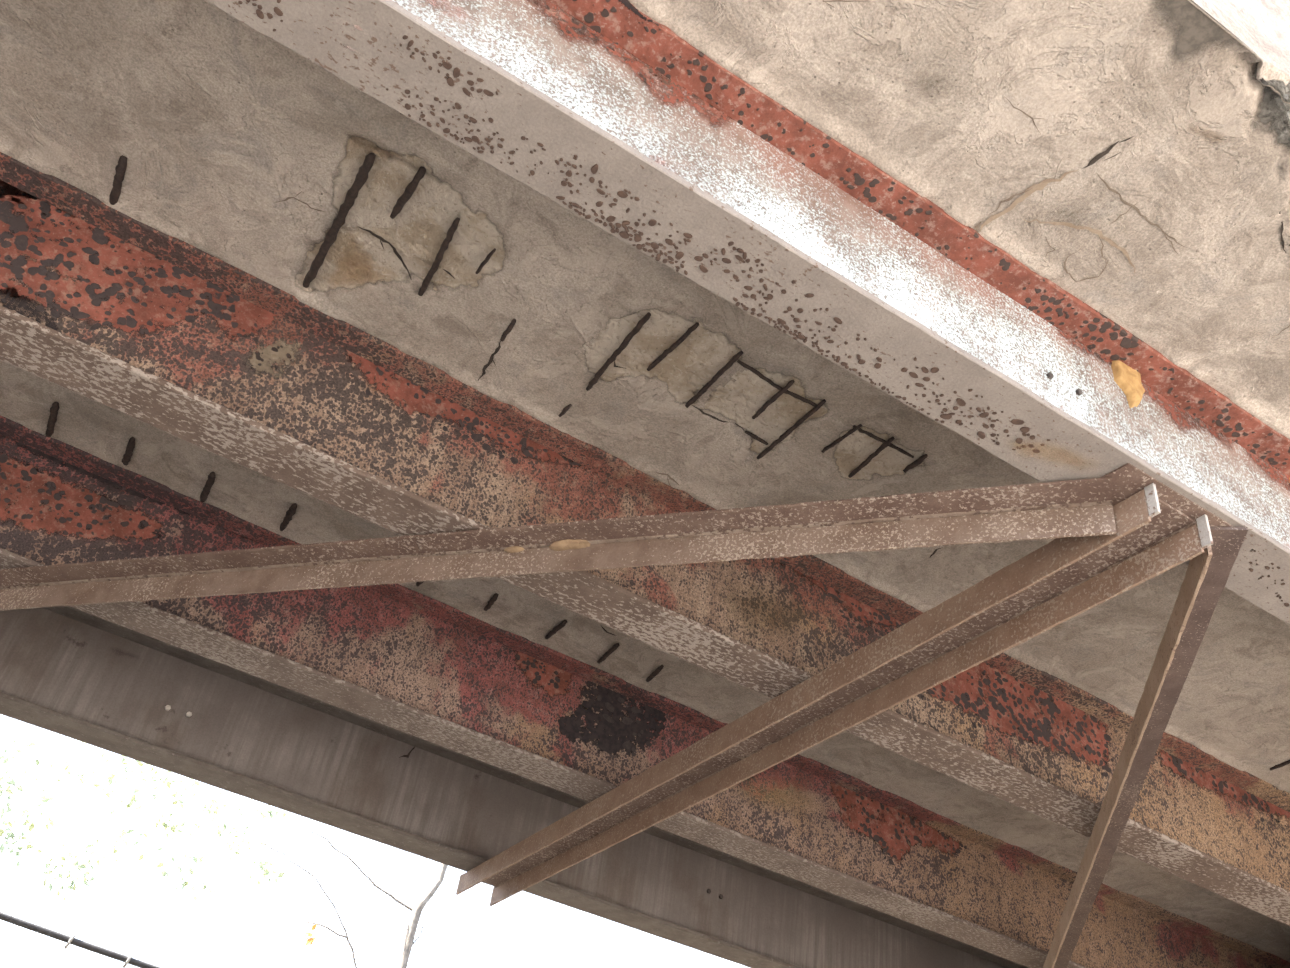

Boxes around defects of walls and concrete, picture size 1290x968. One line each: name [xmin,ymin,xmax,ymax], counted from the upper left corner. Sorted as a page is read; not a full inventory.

leakage [618,0,654,23]
leakage [1156,0,1243,59]
spalling [1253,67,1290,147]
spalling [295,137,505,296]
rust [386,35,1050,453]
spalling [583,309,828,460]
leakage [1,435,215,525]
spalling [821,424,928,480]
rust [1249,549,1289,607]